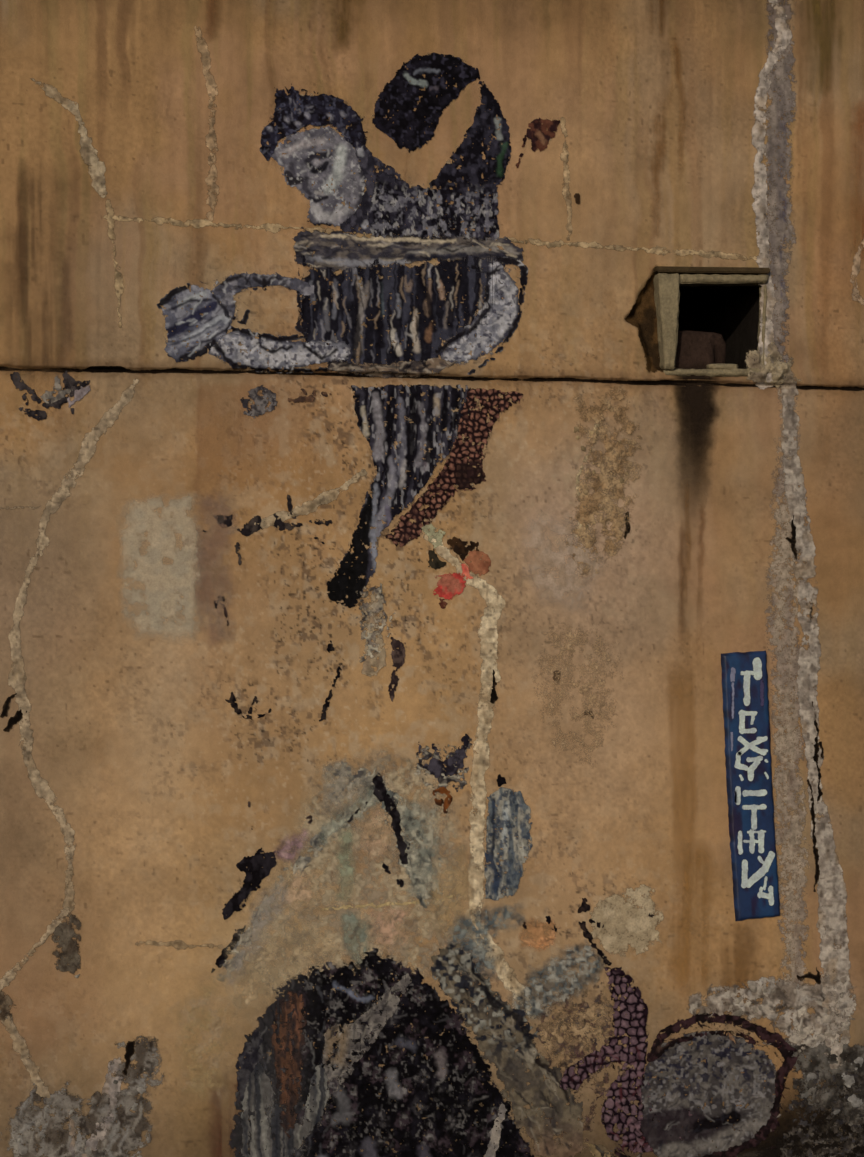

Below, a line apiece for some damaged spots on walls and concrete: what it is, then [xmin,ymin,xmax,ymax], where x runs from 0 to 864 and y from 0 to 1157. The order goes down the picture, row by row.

crack [30,26,372,328]
spalling [566,389,642,575]
crack [496,0,864,1069]
leakage [675,365,717,481]
crack [0,366,697,1019]
flaking render [590,884,664,956]
crack [1,1014,122,1157]
spalling [0,1036,164,1157]